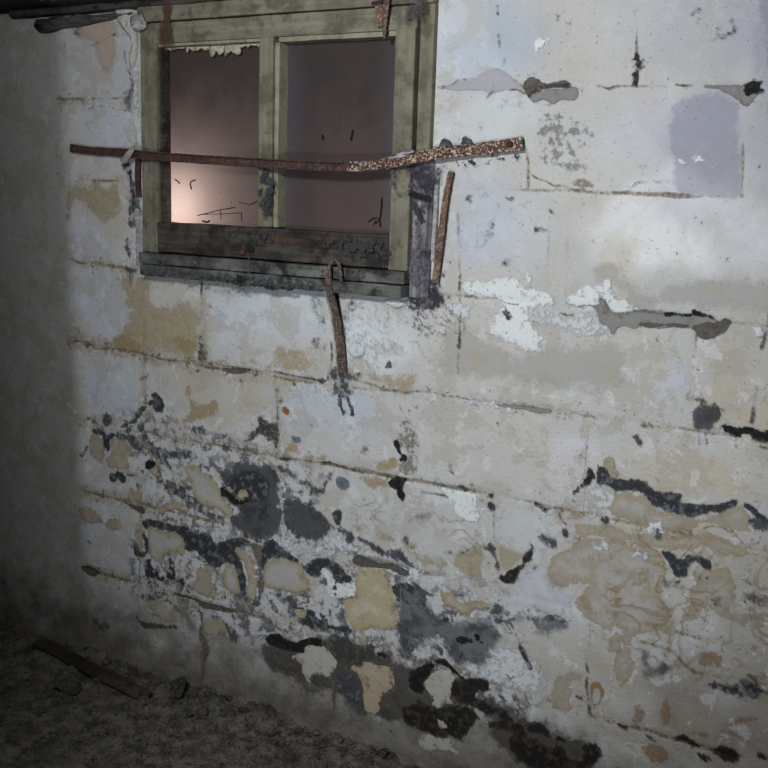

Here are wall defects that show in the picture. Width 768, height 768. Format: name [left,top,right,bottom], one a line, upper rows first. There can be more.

spalling [445,69,578,104]
spalling [704,80,764,106]
corrosion [70,137,524,172]
peeling [538,114,594,188]
corrosion [432,171,454,284]
peeling [461,271,732,353]
crack [72,340,194,362]
crack [227,366,329,381]
crack [349,377,468,419]
water stain [92,385,768,768]